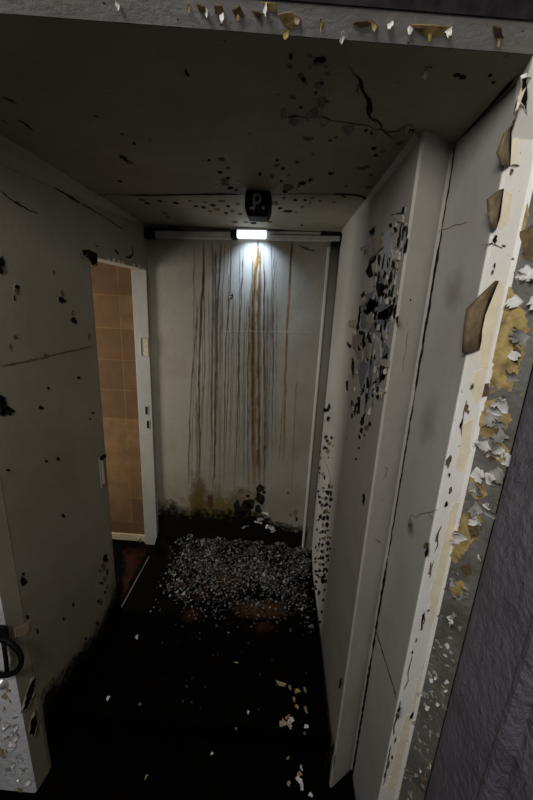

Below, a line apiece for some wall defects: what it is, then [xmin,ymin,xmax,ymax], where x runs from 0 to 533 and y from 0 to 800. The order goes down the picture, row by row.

peeling [187,2,301,39]
crack [289,66,400,138]
peeling [487,189,512,248]
peeling [496,73,531,177]
crack [2,346,91,366]
leakage [158,247,307,548]
corrosion [247,245,268,475]
corrosion [279,245,292,452]
peeling [314,434,334,631]
peeling [346,206,408,461]
crack [351,75,518,785]
peeling [383,203,533,800]